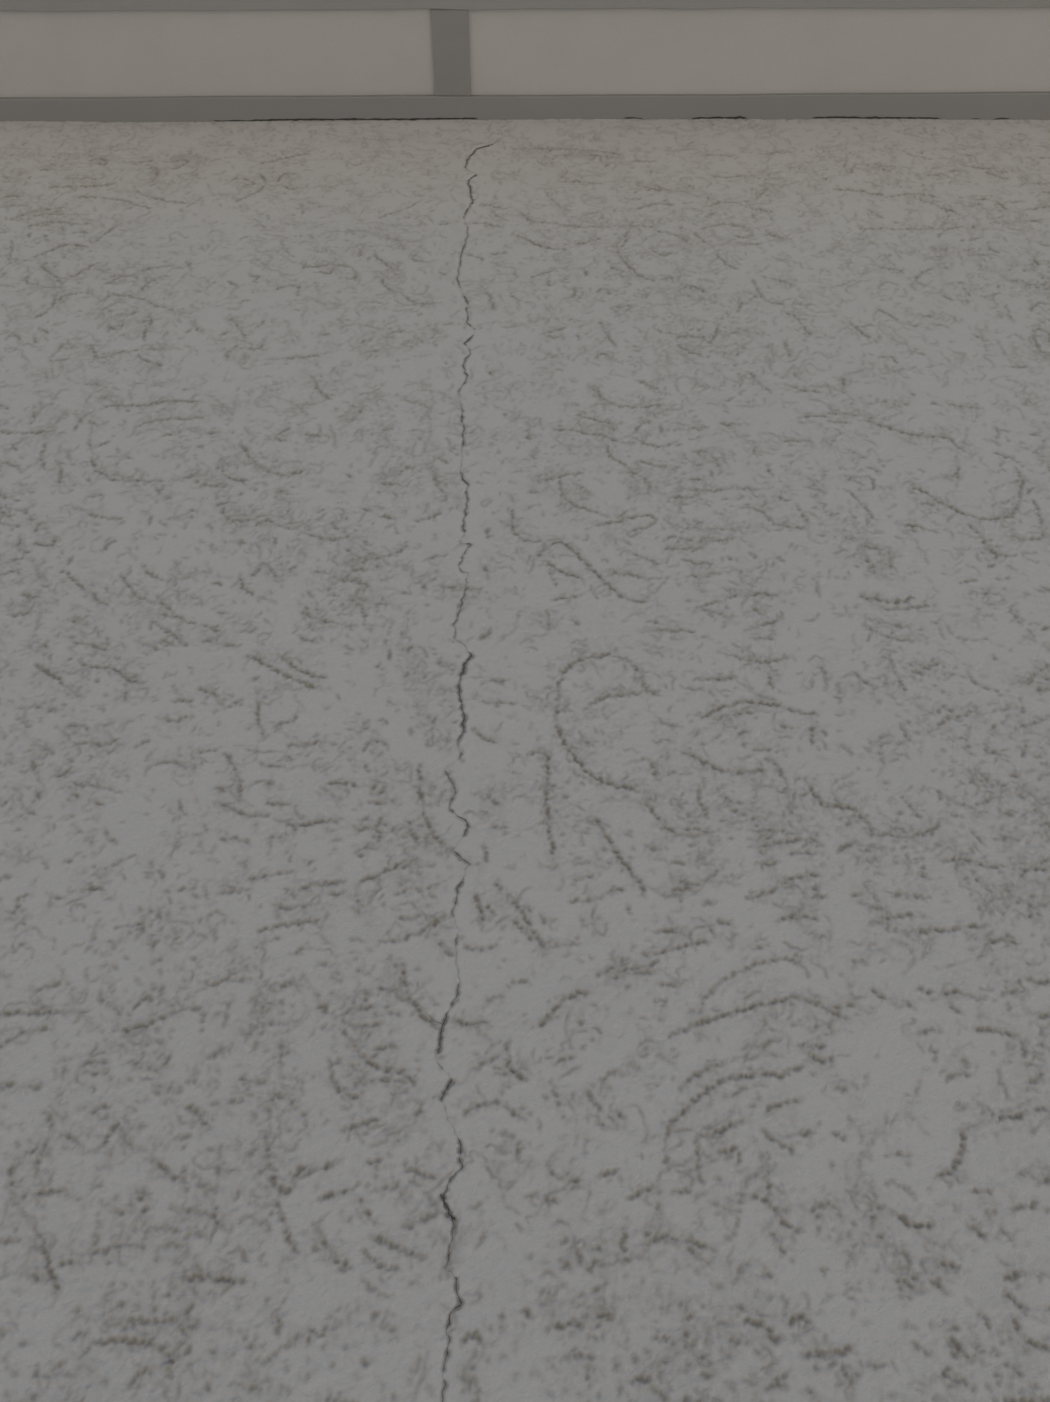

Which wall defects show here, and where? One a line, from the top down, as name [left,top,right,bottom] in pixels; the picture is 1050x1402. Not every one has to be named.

crack [430,138,501,1402]